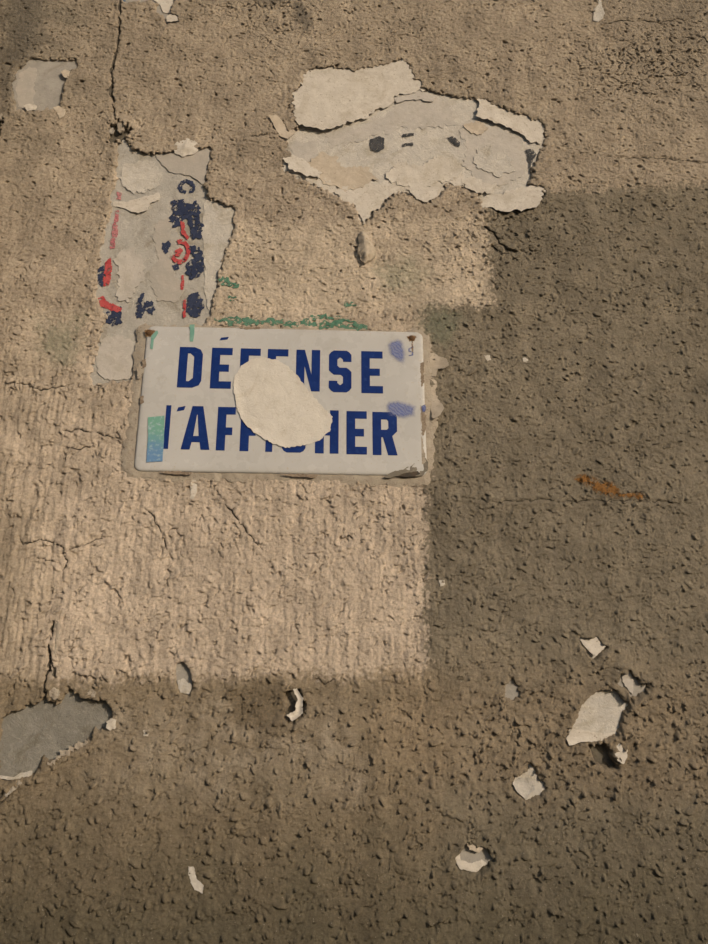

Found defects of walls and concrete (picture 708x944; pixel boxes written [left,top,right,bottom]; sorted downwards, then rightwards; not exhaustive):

peeling [123,0,178,25]
peeling [12,59,78,119]
crack [109,0,121,119]
peeling [269,59,546,224]
crack [44,623,56,695]
flaking render [0,687,116,797]
flaking render [176,662,192,694]
flaking render [285,688,305,723]
peeling [580,637,606,658]
peeling [565,670,646,767]
flaking render [511,763,546,800]
flaking render [455,842,493,872]